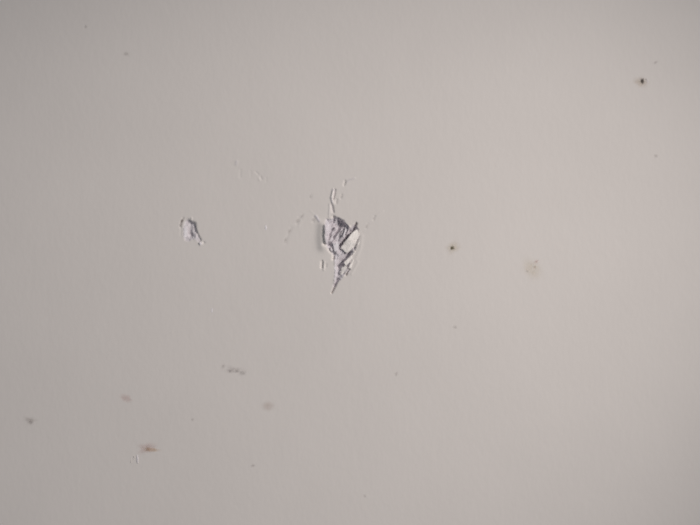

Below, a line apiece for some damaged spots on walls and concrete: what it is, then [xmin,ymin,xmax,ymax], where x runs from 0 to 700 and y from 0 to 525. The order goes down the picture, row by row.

spalling [178,216,206,246]
spalling [283,177,384,295]